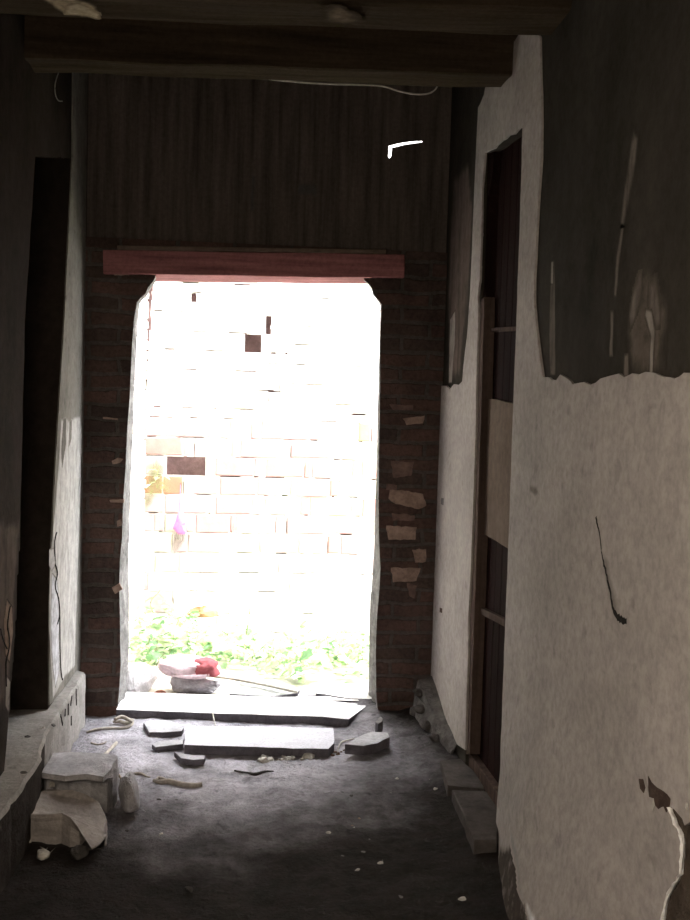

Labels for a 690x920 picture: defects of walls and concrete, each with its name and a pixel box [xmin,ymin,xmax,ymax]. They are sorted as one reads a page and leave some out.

spalling [390,404,425,425]
spalling [386,460,426,598]
crack [595,516,629,630]
spalling [639,776,690,920]